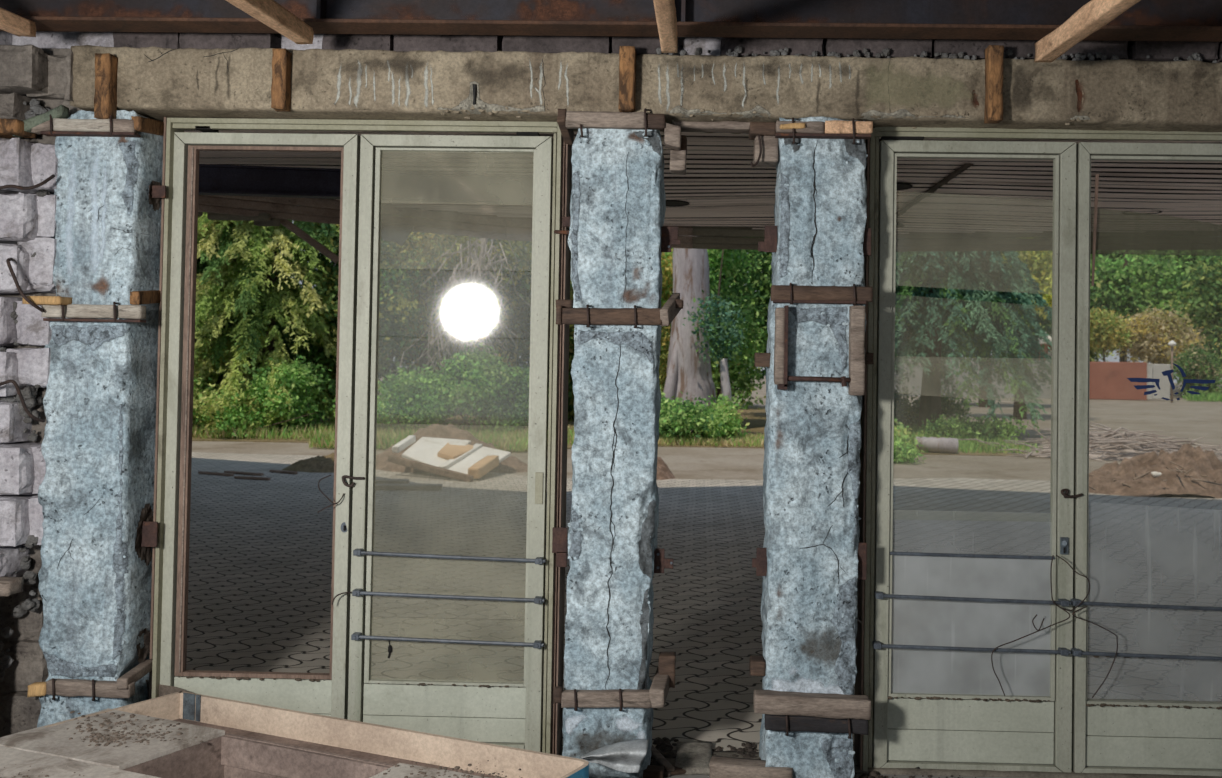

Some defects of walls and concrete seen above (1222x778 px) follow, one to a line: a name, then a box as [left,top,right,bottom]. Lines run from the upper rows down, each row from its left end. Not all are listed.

water stain [335,59,434,106]
crack [622,152,630,303]
crack [809,144,817,272]
crack [800,419,860,584]